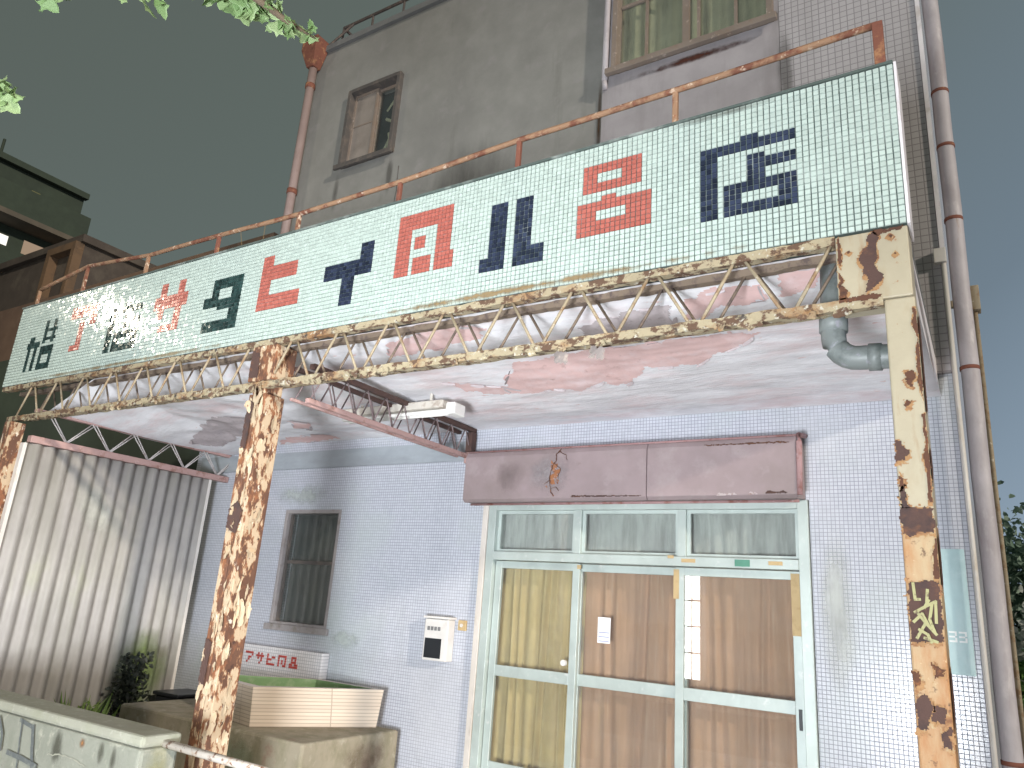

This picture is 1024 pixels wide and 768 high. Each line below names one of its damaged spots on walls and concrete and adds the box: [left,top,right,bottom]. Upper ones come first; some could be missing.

rust [658,42,738,71]
rust [413,267,629,309]
peeling [442,268,820,395]
peeling [832,304,853,318]
rust [836,225,903,304]
rust [249,351,260,378]
rust [240,400,254,449]
crack [546,448,567,496]
rust [893,306,944,648]
rust [226,500,243,533]
rust [198,637,212,684]
rust [911,661,956,756]